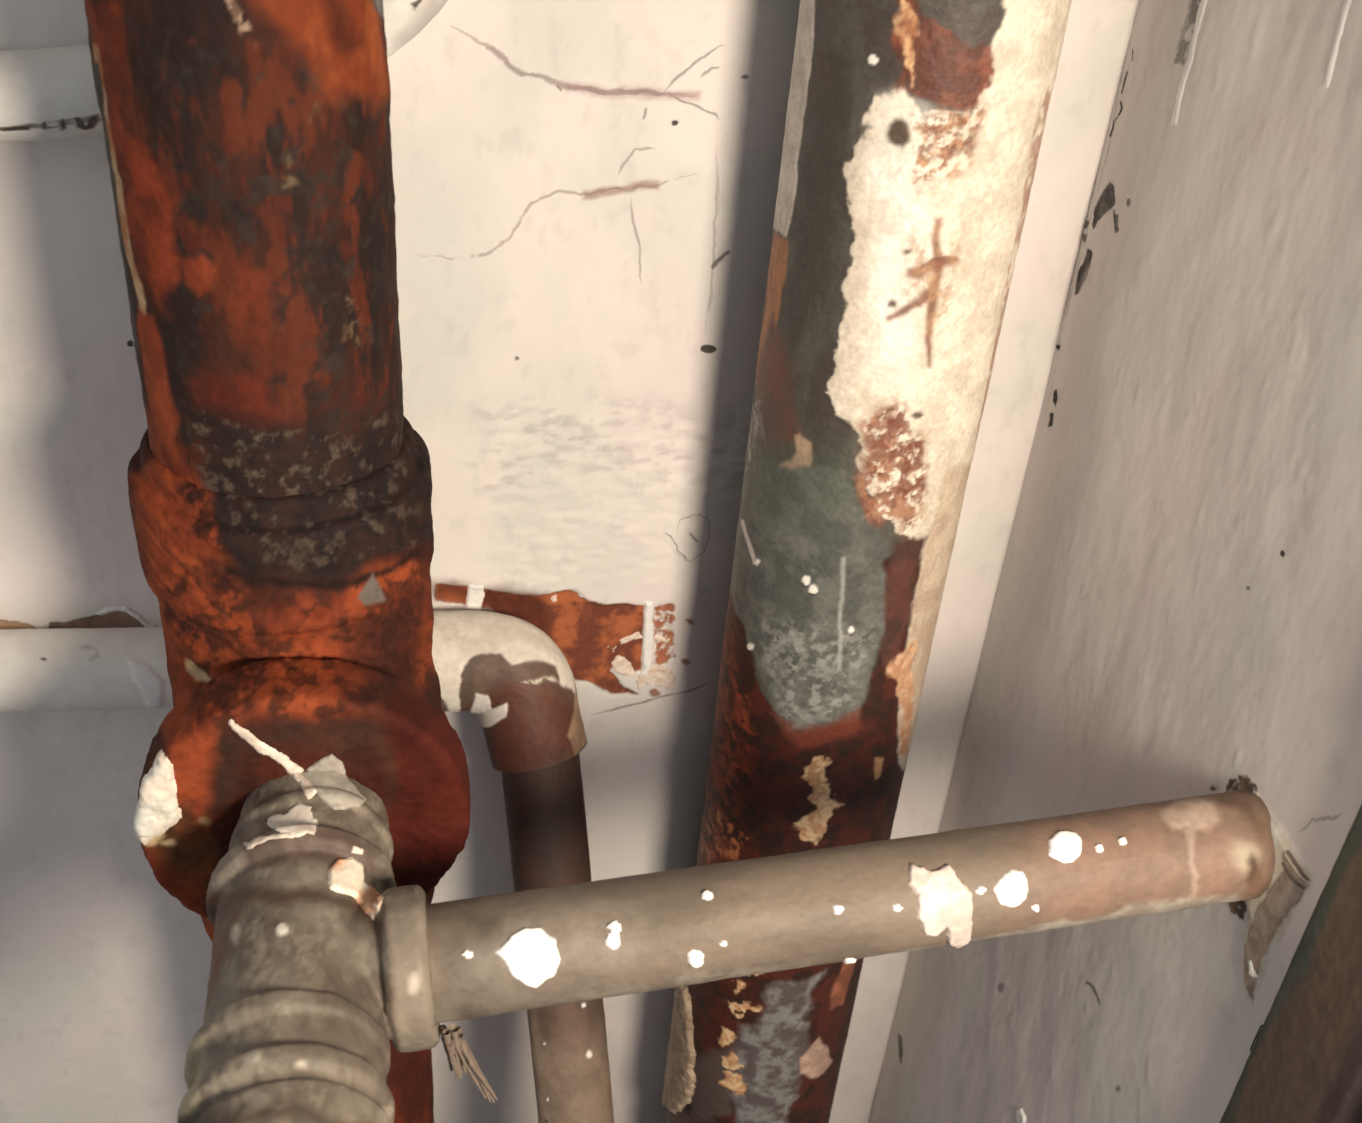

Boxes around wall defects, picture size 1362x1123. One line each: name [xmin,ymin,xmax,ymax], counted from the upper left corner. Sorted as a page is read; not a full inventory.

crack [493,49,654,93]
crack [586,182,657,197]
peeling [0,606,156,629]
peeling [435,584,692,696]
peeling [1244,853,1308,999]